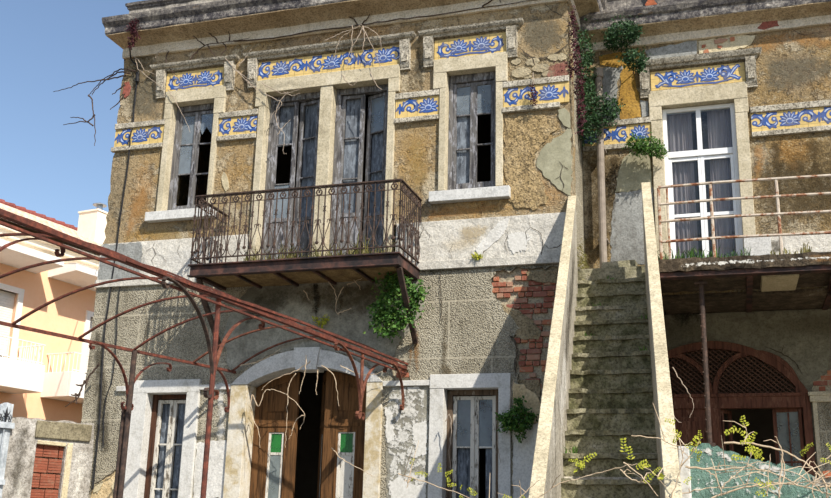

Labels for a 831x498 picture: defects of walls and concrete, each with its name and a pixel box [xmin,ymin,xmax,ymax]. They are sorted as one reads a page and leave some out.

spalling [698,20,779,54]
spalling [509,47,570,81]
water stain [761,142,831,221]
crack [505,216,560,255]
flaking render [492,267,559,498]
flaking render [812,370,831,392]
peeling [384,366,428,498]